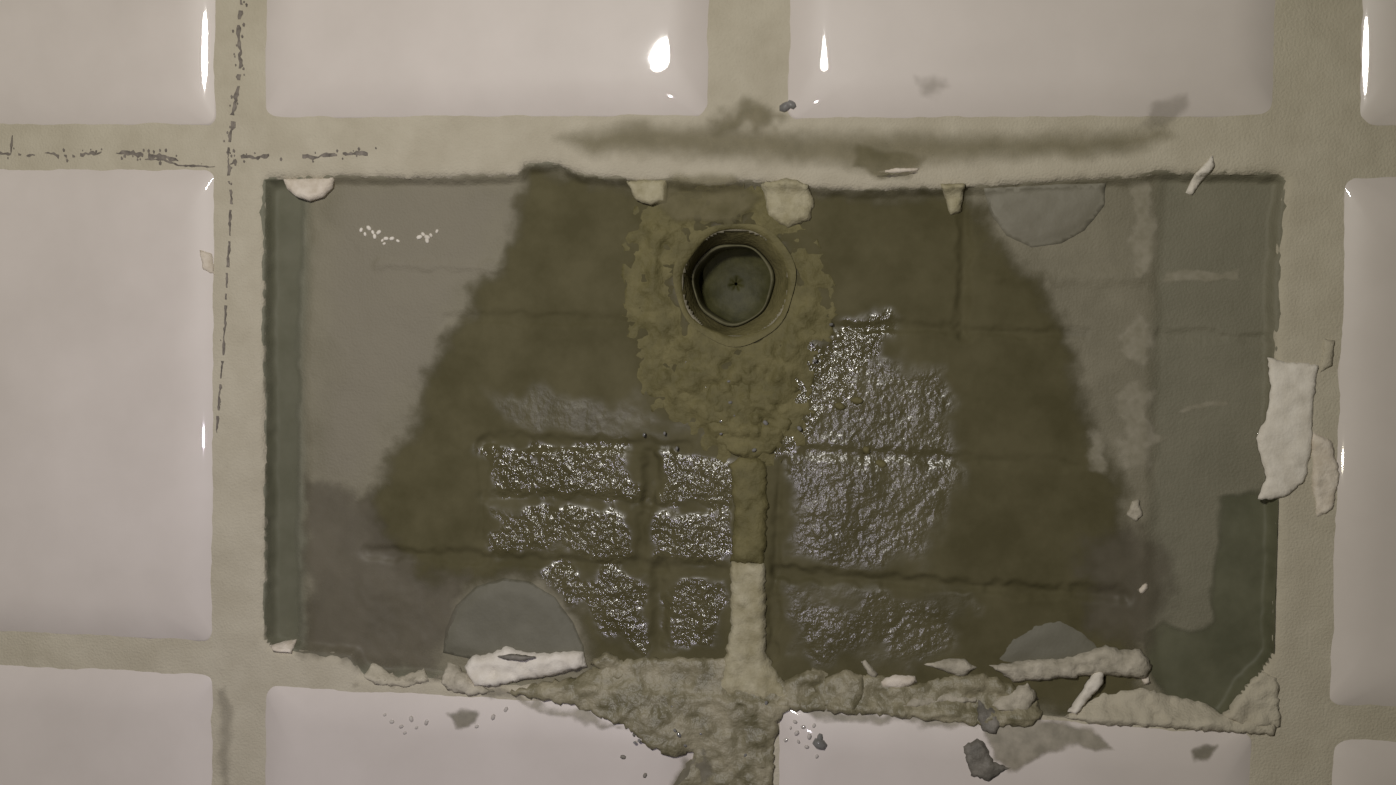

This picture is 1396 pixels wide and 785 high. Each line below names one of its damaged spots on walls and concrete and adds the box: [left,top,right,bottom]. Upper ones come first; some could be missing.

crack [0,0,376,432]
peeling [284,177,335,202]
peeling [626,179,668,206]
peeling [761,178,814,228]
peeling [941,183,965,216]
peeling [1186,155,1215,195]
damp [264,109,1278,714]
peeling [1256,338,1340,517]
peeling [1127,499,1143,521]
peeling [465,646,588,687]